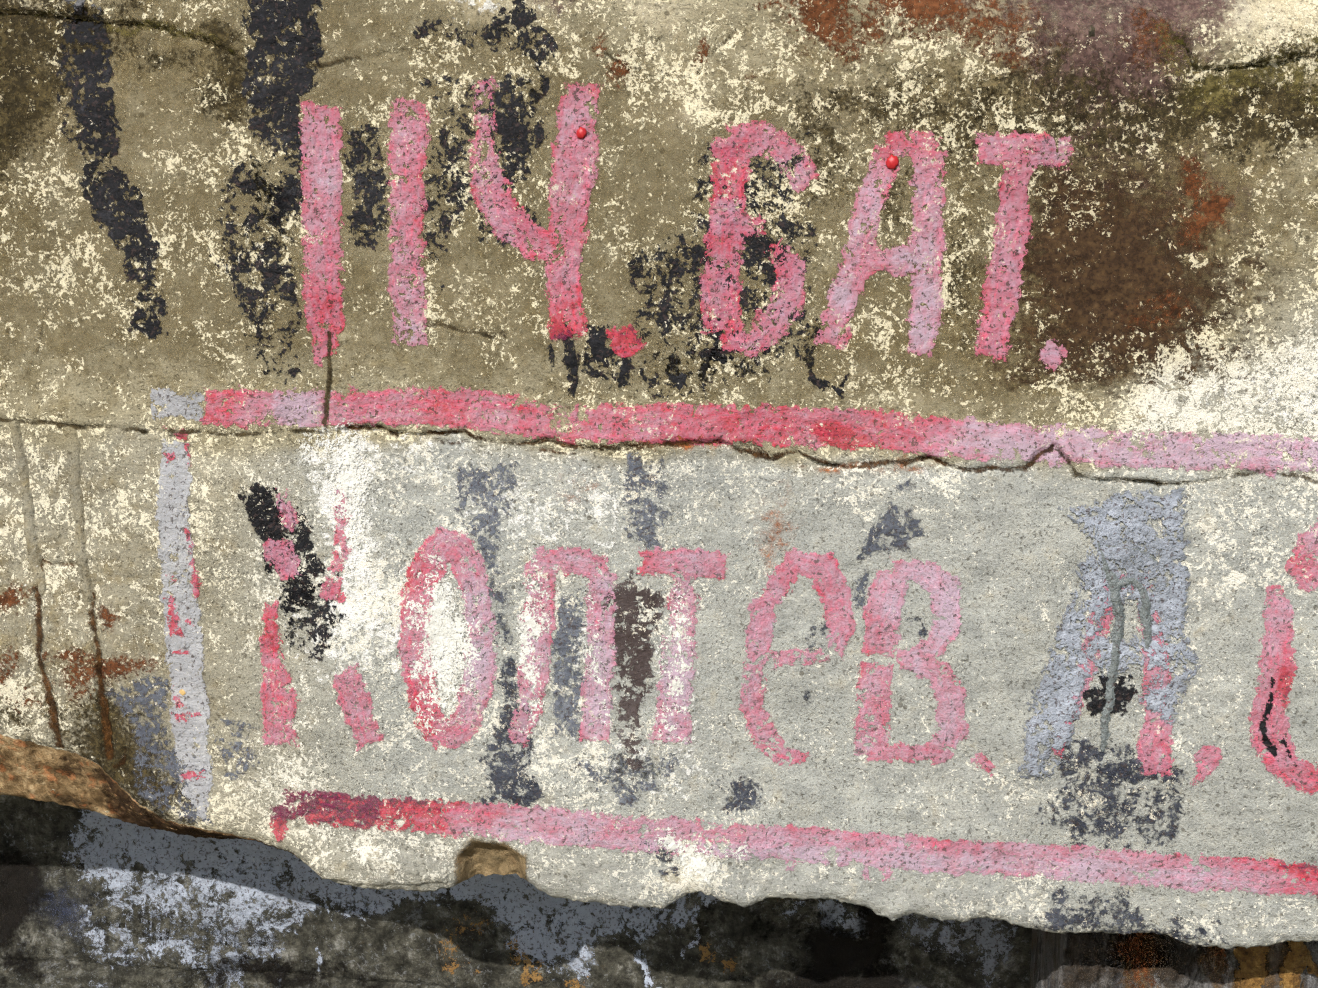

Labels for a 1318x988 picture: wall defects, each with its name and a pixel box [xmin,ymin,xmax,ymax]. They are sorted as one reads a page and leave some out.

crack [306,55,362,68]
crack [604,35,730,77]
corrosion [758,0,1052,69]
crack [1173,37,1310,71]
crack [0,331,1200,485]
crack [1234,470,1318,483]
crack [34,559,74,748]
crack [88,592,126,768]
peeling [0,734,738,988]